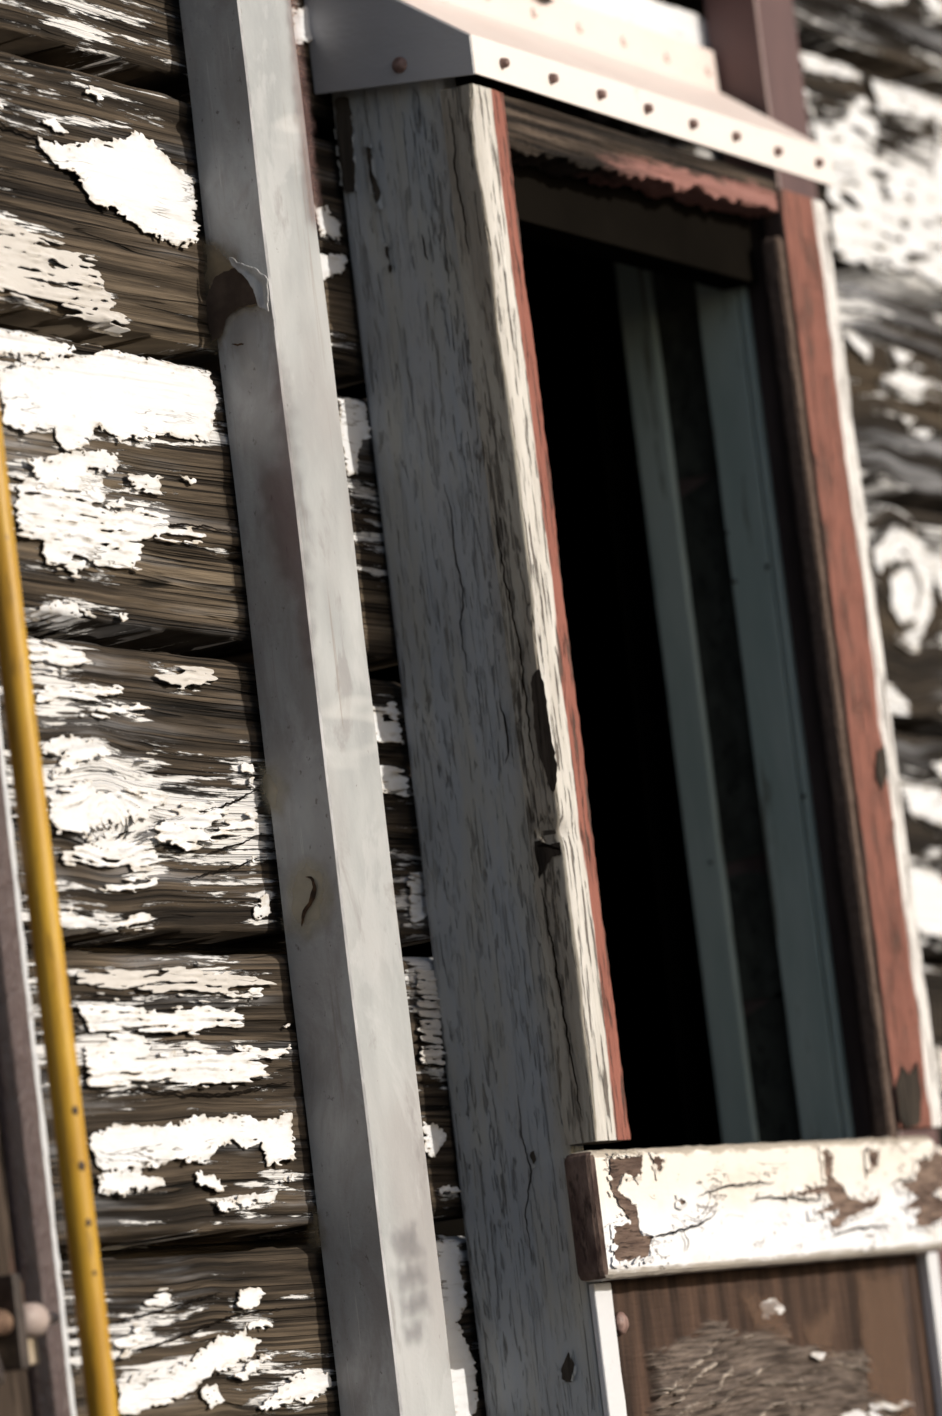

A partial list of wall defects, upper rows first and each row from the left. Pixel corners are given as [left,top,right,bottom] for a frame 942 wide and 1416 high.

peeling [37,117,201,249]
peeling [799,52,942,291]
peeling [0,213,219,579]
peeling [872,525,942,653]
peeling [28,640,151,719]
peeling [154,666,218,690]
peeling [40,734,258,893]
peeling [76,962,292,1088]
peeling [89,1113,297,1213]
peeling [608,1150,667,1269]
peeling [113,1287,273,1415]
peeling [259,1368,332,1411]